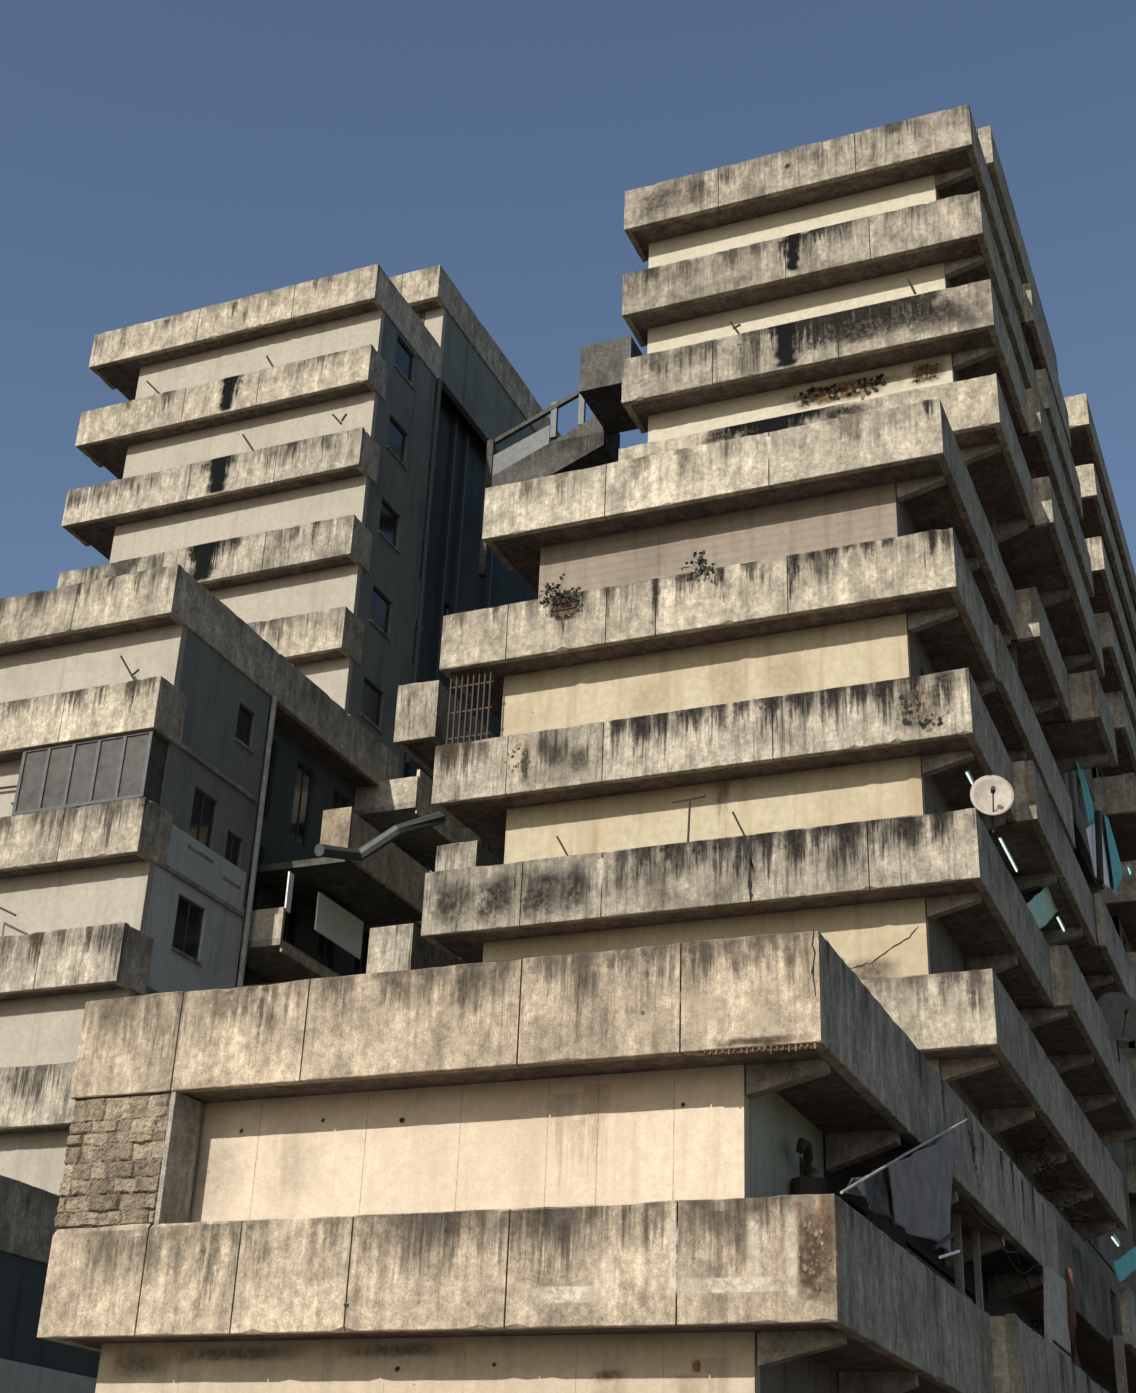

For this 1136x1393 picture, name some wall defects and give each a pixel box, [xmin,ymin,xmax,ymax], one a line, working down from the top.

leakage [778,222,847,270]
leakage [739,291,957,367]
leakage [188,537,240,581]
leakage [611,671,951,755]
leakage [438,811,964,918]
crack [850,926,919,972]
leakage [501,1208,570,1250]
leakage [543,1259,610,1303]
leakage [669,1233,677,1290]
leakage [707,1196,797,1295]